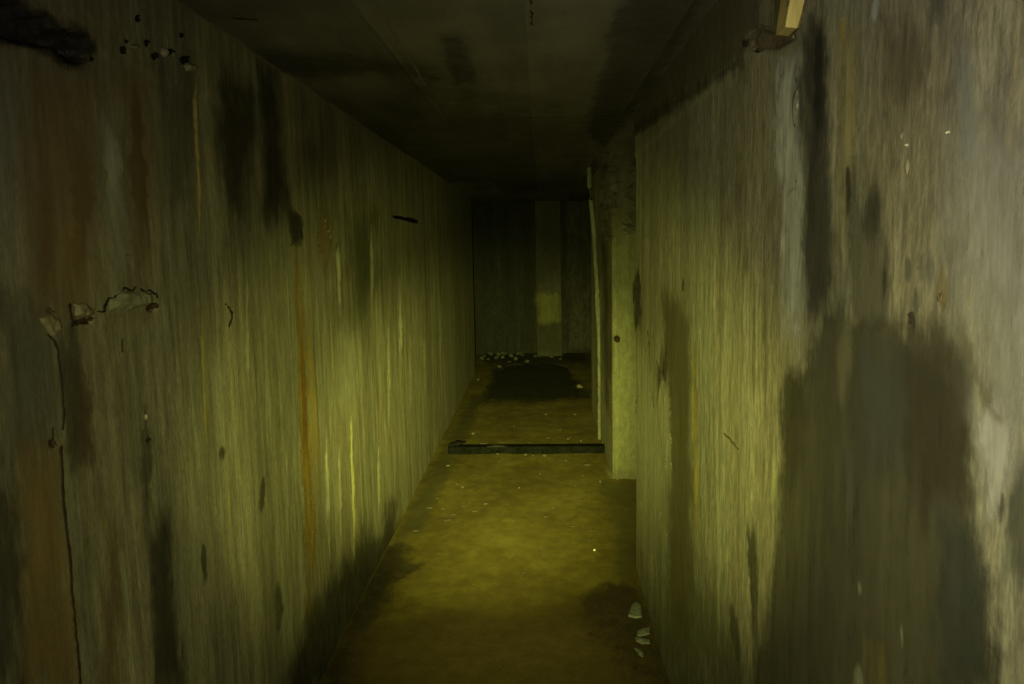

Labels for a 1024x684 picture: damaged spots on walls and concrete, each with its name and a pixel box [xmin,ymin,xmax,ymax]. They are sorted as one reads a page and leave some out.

crack [46,286,159,684]
rust [289,210,302,245]
rust [296,265,317,574]
water stain [746,23,1024,684]